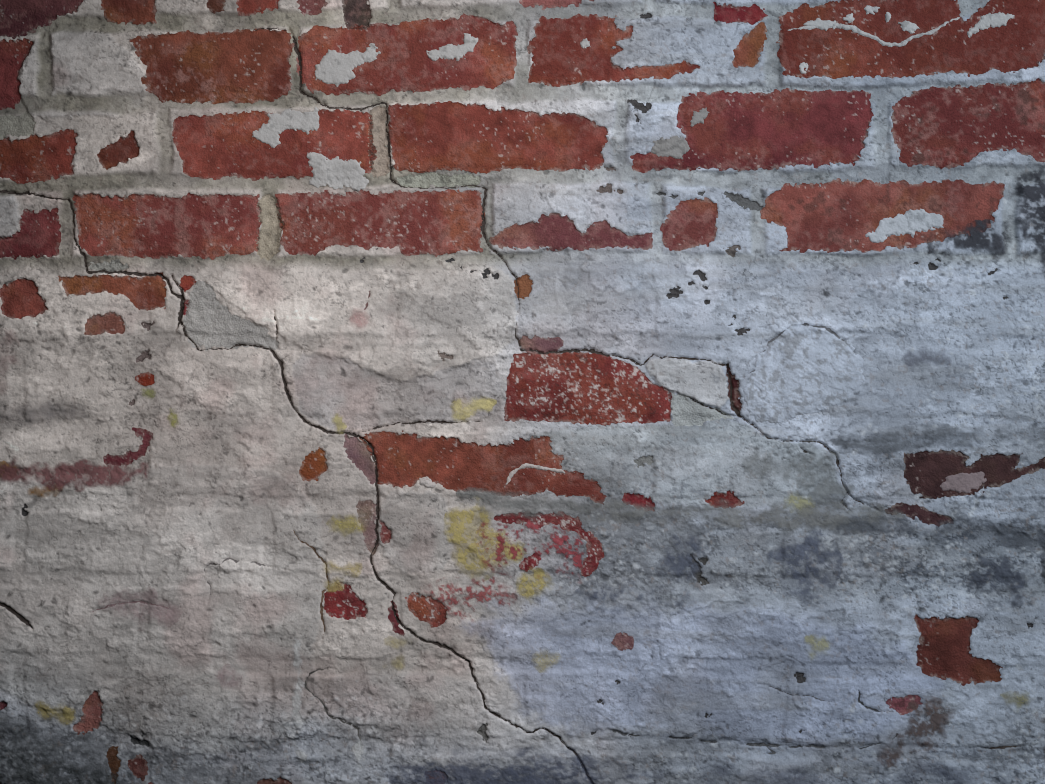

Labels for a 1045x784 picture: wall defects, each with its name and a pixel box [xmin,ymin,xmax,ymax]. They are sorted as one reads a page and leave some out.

peeling [0,0,84,184]
peeling [58,0,1045,331]
peeling [0,278,48,319]
crack [253,28,872,509]
peeling [504,335,672,426]
crack [0,190,594,784]
peeling [343,430,607,505]
peeling [885,449,1045,527]
peeling [914,614,1003,686]
damp [0,756,116,784]
damp [392,756,599,784]
damp [880,698,948,768]